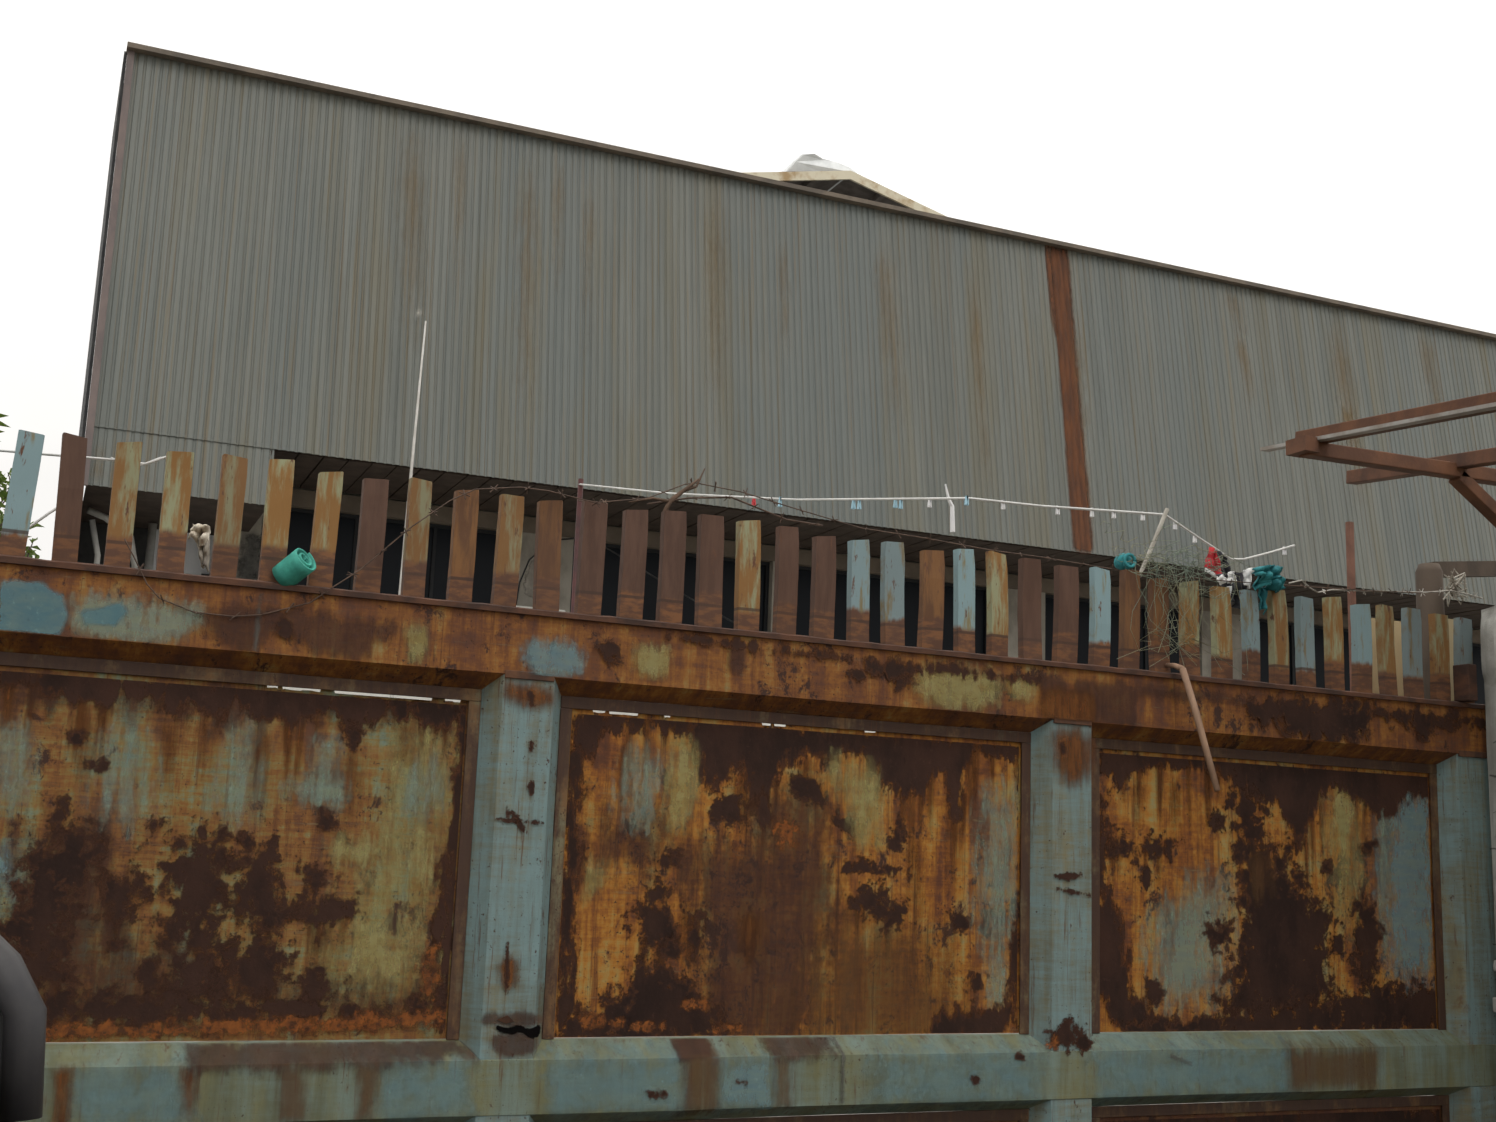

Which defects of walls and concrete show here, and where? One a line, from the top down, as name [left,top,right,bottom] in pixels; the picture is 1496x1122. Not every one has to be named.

rust [1045,245,1093,552]
rust [209,605,396,659]
rust [594,639,624,668]
rust [665,633,1486,1033]
rust [0,671,474,1108]
rust [555,714,1019,1111]
rust [1042,1017,1095,1057]
rust [54,1070,70,1122]
rust [1103,1109,1440,1122]